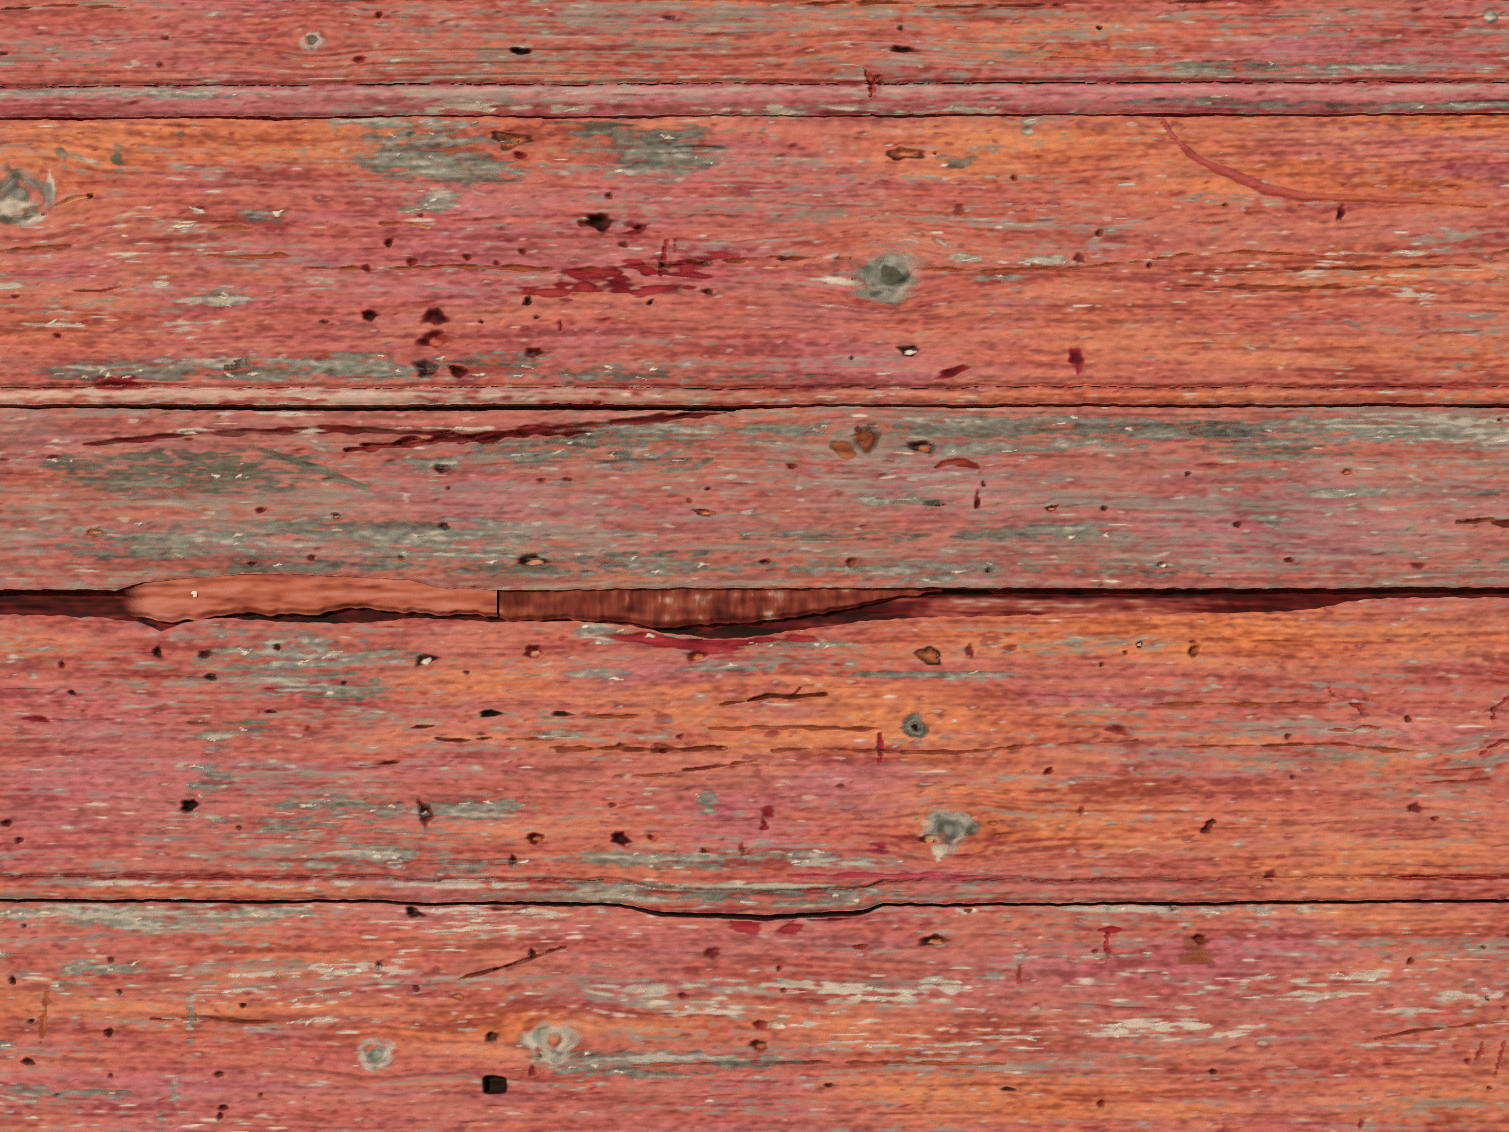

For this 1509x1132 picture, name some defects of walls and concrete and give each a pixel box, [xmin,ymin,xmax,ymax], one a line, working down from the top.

peeling [333,101,533,213]
peeling [552,105,724,176]
crack [914,250,1371,293]
crack [1411,249,1509,268]
peeling [41,428,312,495]
peeling [387,422,829,472]
peeling [891,413,1509,473]
peeling [57,517,1006,582]
peeling [1059,905,1331,914]
peeling [162,959,413,1043]
peeling [587,972,1003,1029]
peeling [1088,1018,1250,1038]